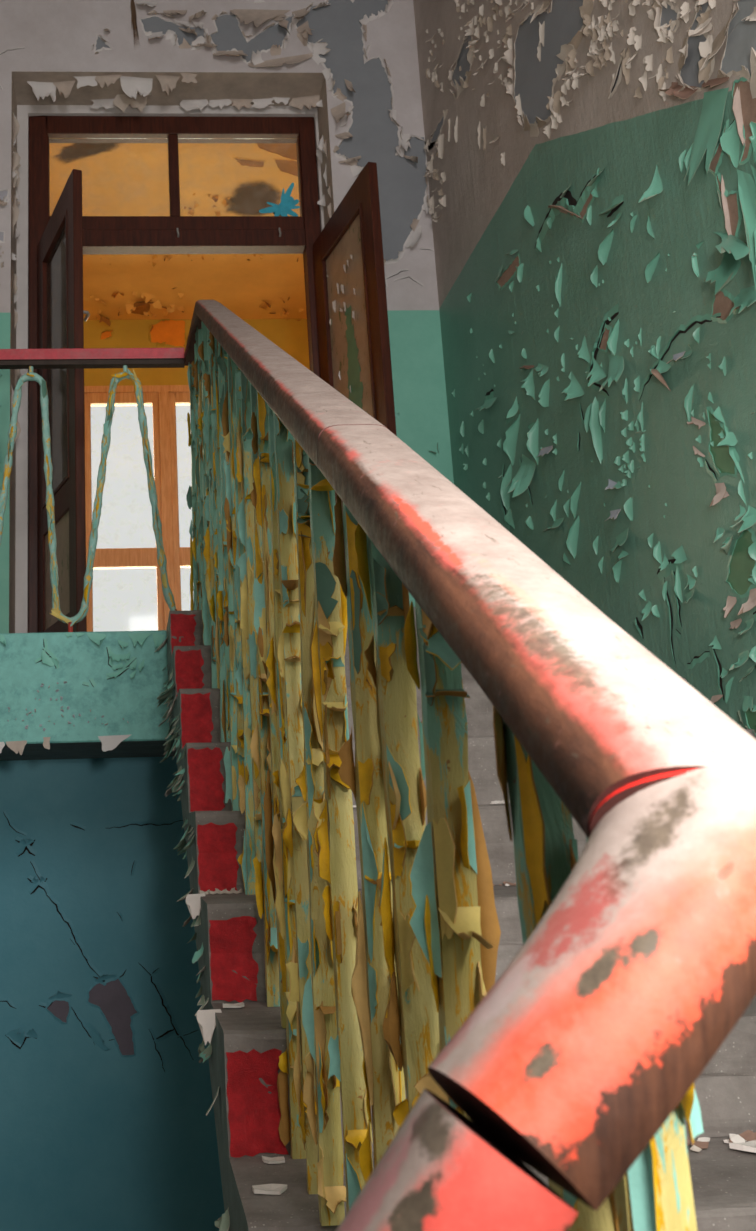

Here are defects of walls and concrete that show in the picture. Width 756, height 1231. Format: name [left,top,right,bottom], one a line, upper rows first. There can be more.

peeling [27,0,756,323]
peeling [459,313,523,470]
peeling [482,257,654,584]
peeling [46,368,168,679]
crack [633,533,734,704]
peeling [0,681,131,755]
crack [3,811,108,981]
crack [70,818,183,830]
crack [5,1028,38,1049]
spalling [39,968,140,1058]
crack [138,960,198,1072]
peeling [215,1209,230,1231]